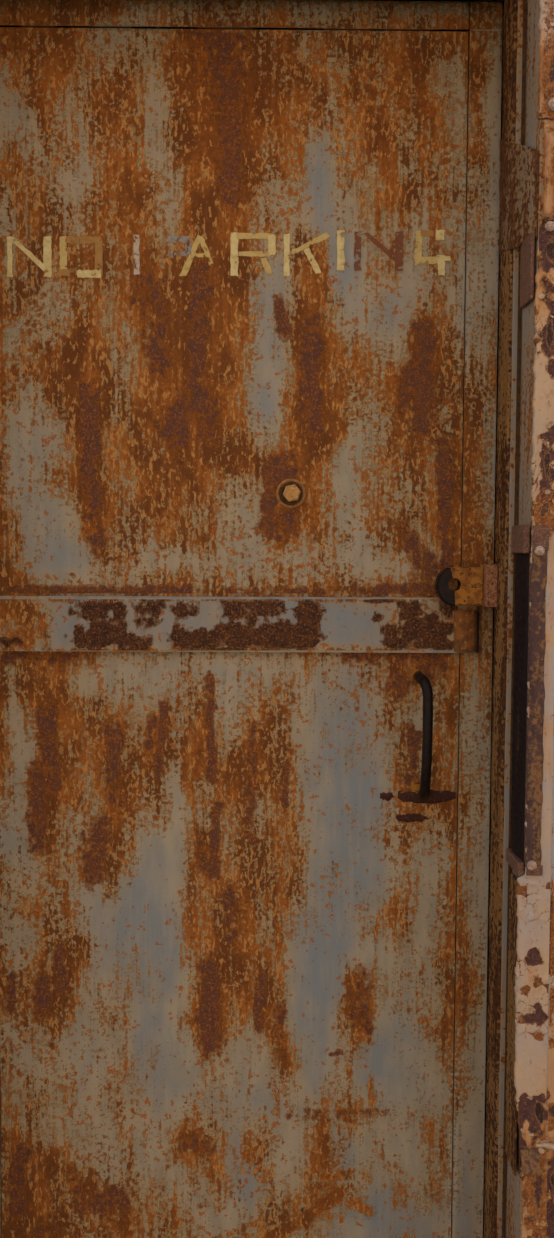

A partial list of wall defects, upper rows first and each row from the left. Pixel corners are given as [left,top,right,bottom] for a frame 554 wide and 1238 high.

corrosion [82,944,141,1043]
corrosion [372,1136,410,1215]
corrosion [519,1093,554,1238]